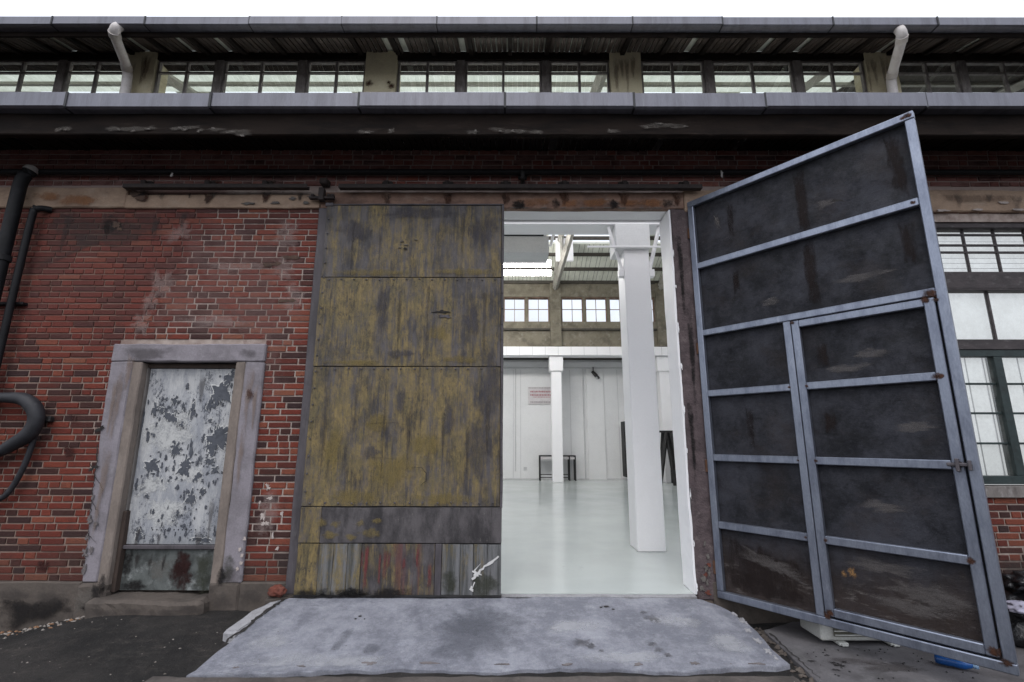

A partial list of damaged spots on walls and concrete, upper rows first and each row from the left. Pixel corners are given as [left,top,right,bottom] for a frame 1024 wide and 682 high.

peeling [134,368,235,545]